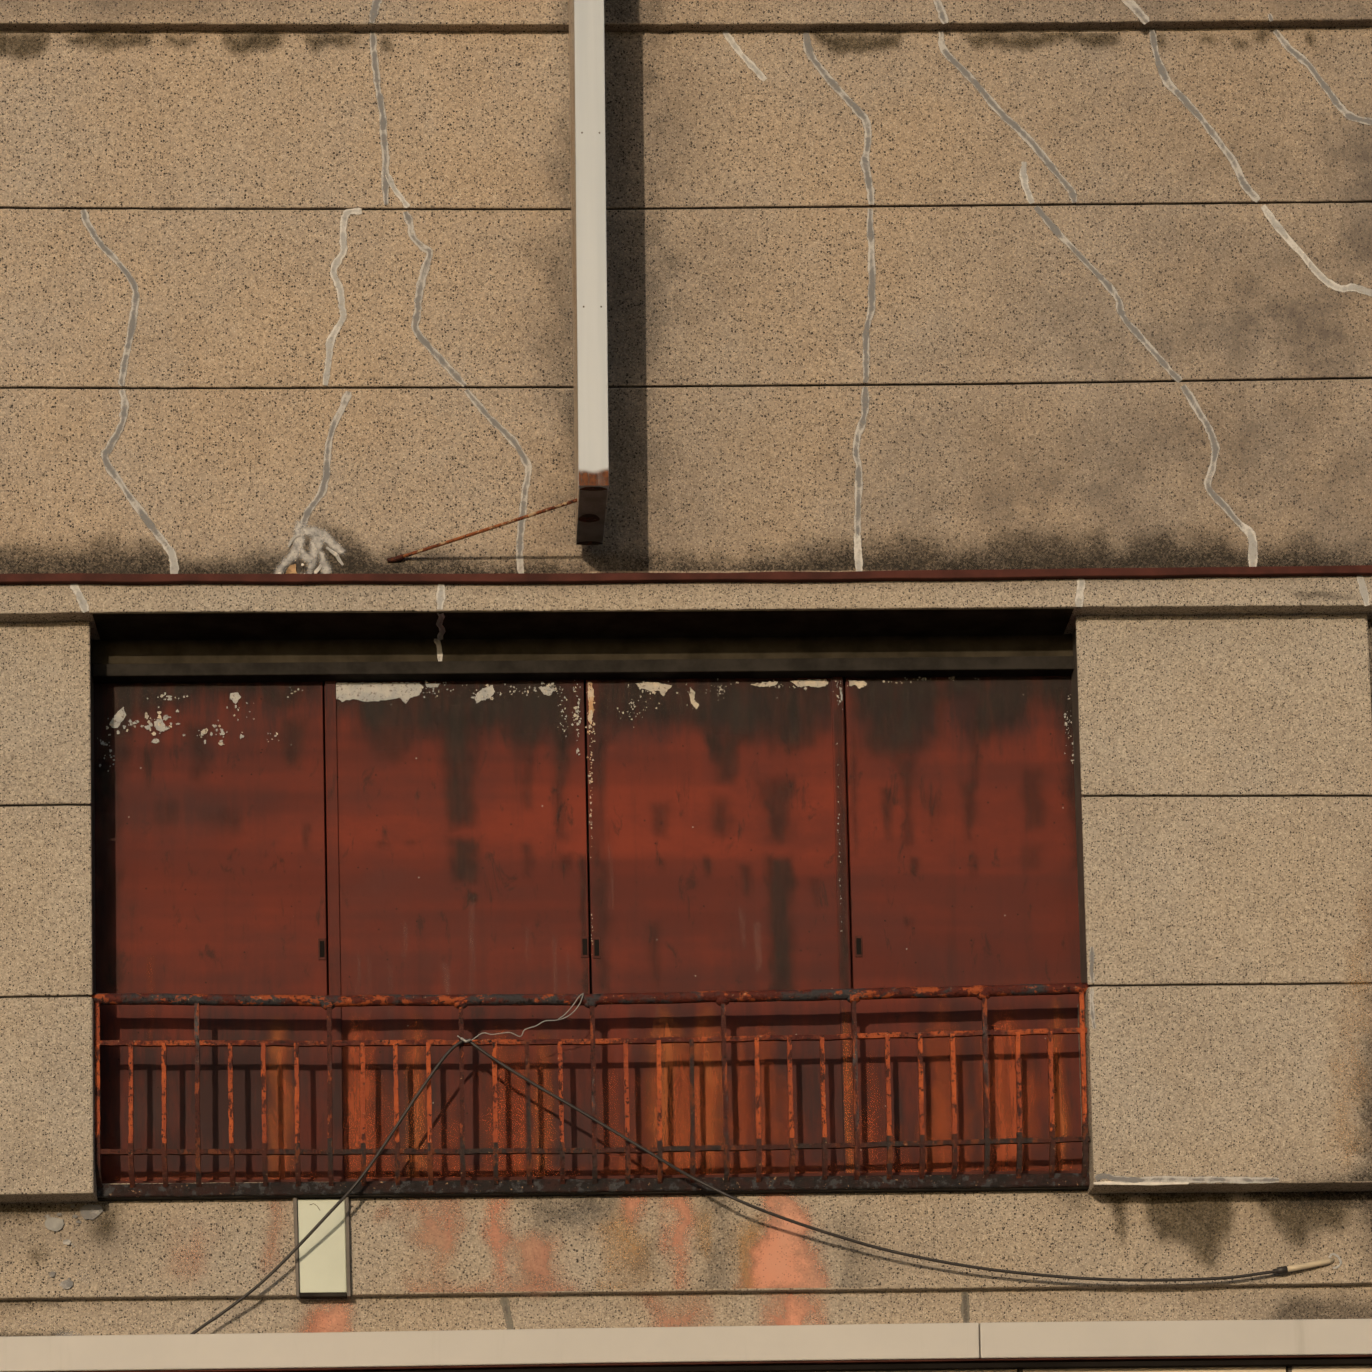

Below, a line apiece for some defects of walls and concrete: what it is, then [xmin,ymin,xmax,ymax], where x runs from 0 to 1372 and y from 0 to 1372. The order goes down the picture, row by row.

leakage [0,35,48,58]
leakage [226,34,279,52]
crack [1121,0,1372,297]
crack [293,0,532,573]
crack [933,0,1258,567]
leakage [0,537,560,574]
peeling [97,692,254,772]
peeling [336,680,596,858]
peeling [711,676,931,710]
corrosion [621,1018,721,1175]
corrosion [982,1015,1035,1171]
corrosion [742,1194,826,1325]